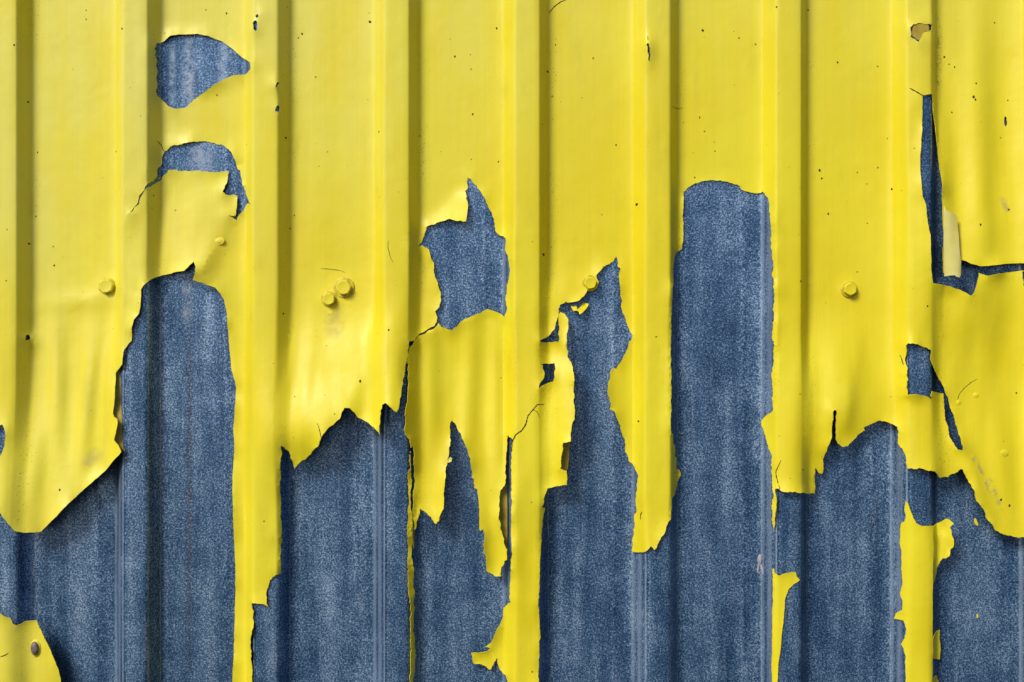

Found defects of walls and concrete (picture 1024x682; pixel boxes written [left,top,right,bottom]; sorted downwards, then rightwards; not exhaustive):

peeling [0,141,250,682]
peeling [156,34,250,109]
peeling [251,178,515,682]
crack [511,404,544,452]
peeling [538,180,1024,682]
peeling [920,95,1024,294]